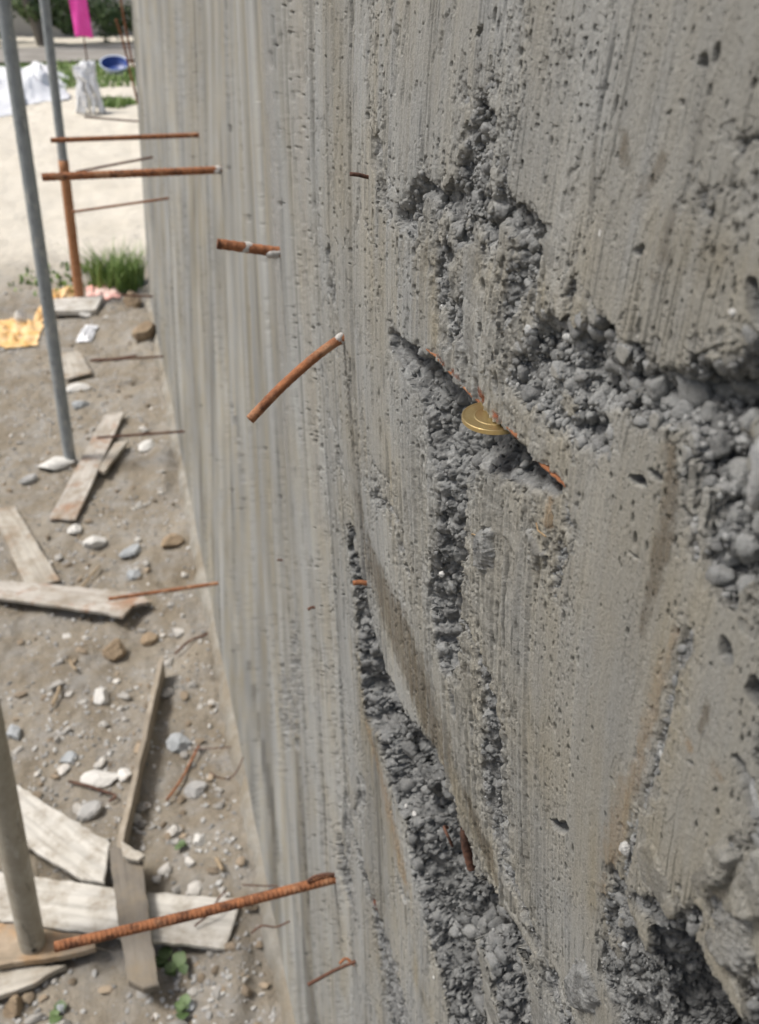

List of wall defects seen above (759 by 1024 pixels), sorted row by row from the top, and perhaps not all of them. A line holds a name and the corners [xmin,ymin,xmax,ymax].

spalling [363,464,413,583]
spalling [429,488,472,673]
spalling [389,81,759,610]
peeling [362,650,575,1024]
peeling [601,630,759,1024]